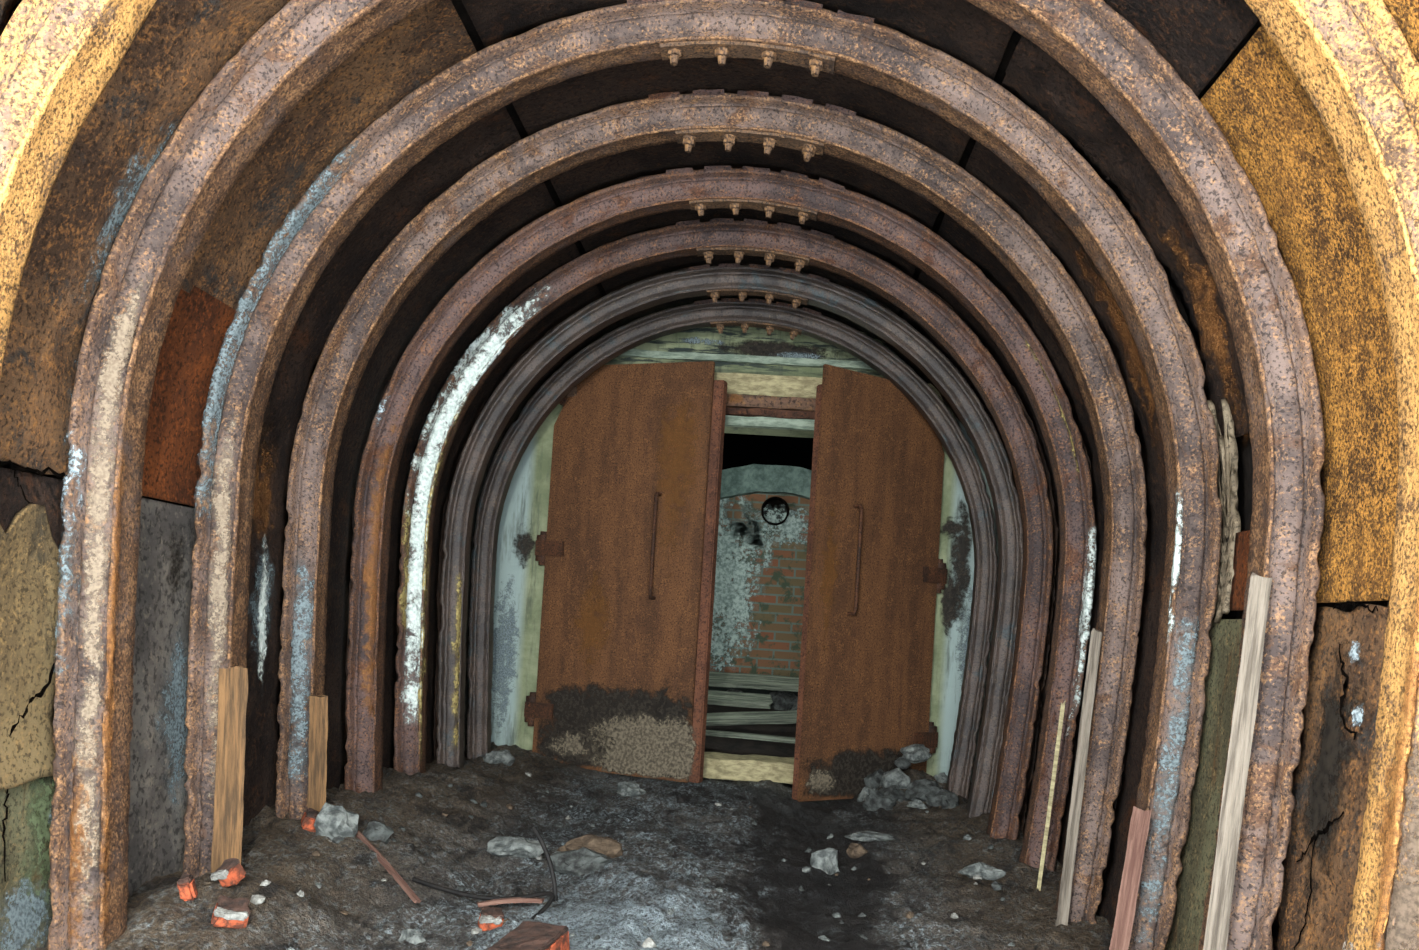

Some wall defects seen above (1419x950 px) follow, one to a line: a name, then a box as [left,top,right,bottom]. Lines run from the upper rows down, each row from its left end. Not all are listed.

crack [5,662,55,742]
rust [102,469,124,788]
leakage [399,286,548,755]
leakage [940,500,973,682]
rust [69,784,110,922]